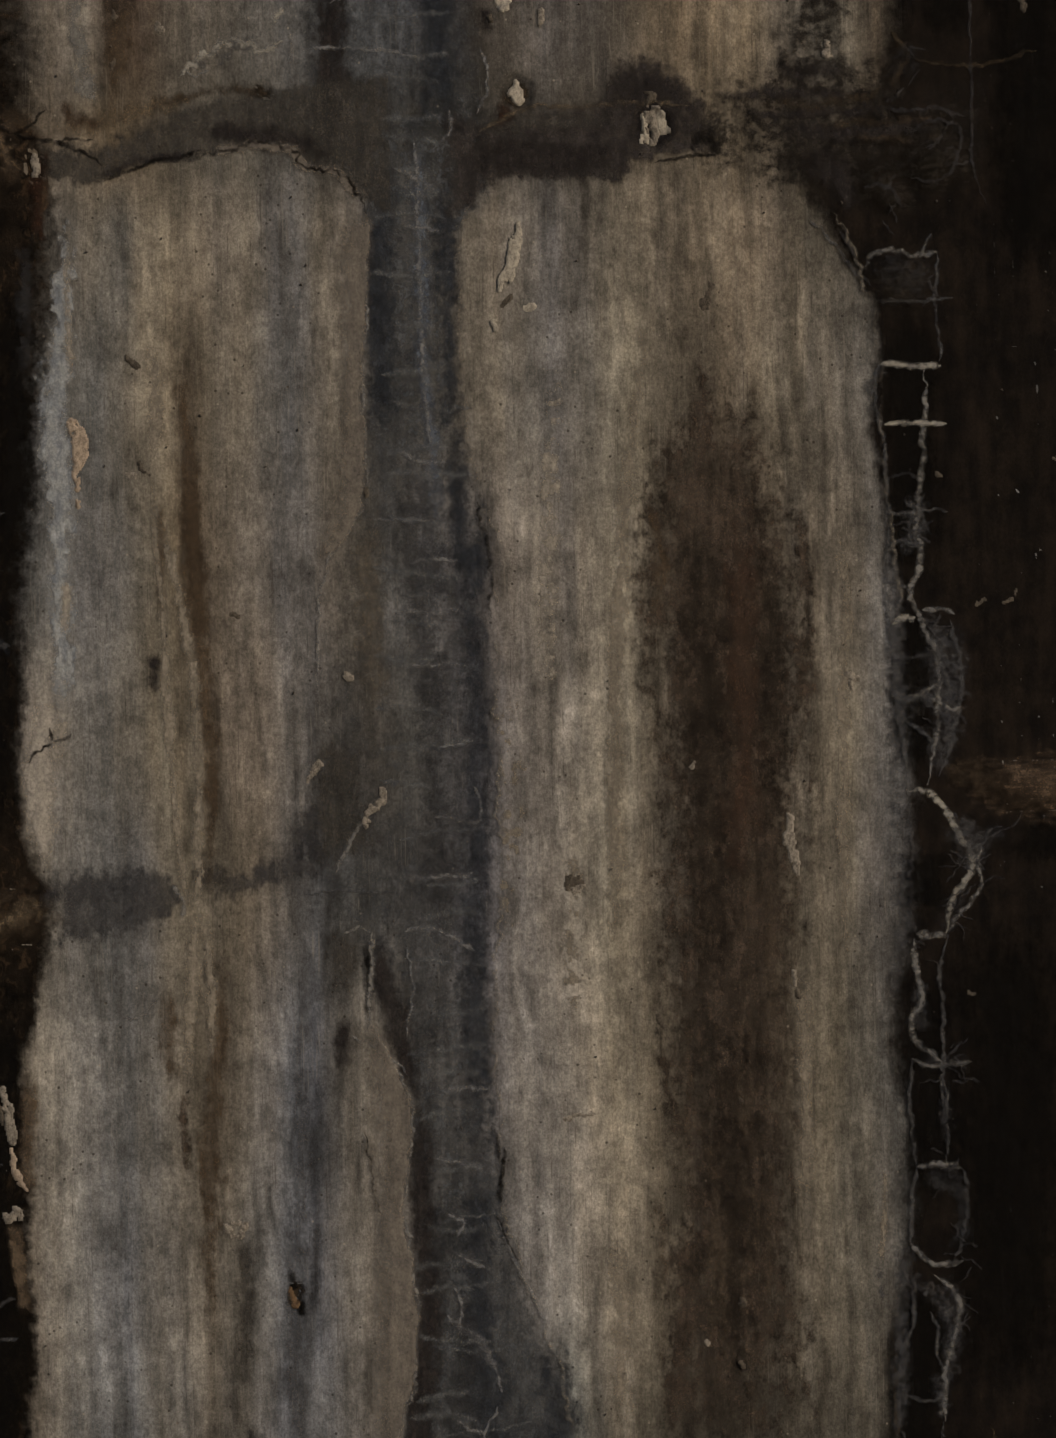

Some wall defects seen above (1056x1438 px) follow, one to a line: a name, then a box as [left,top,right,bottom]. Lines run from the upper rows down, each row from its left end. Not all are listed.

peeling [498,79,529,124]
crack [394,57,688,464]
peeling [632,91,672,146]
crack [810,3,1037,302]
peeling [66,418,89,509]
damp [0,0,723,1438]
damp [725,0,1056,1438]
crack [313,823,475,1066]
damp [605,334,817,1434]
crack [870,343,1022,1436]
peeling [0,1086,38,1307]
crack [447,1214,547,1438]